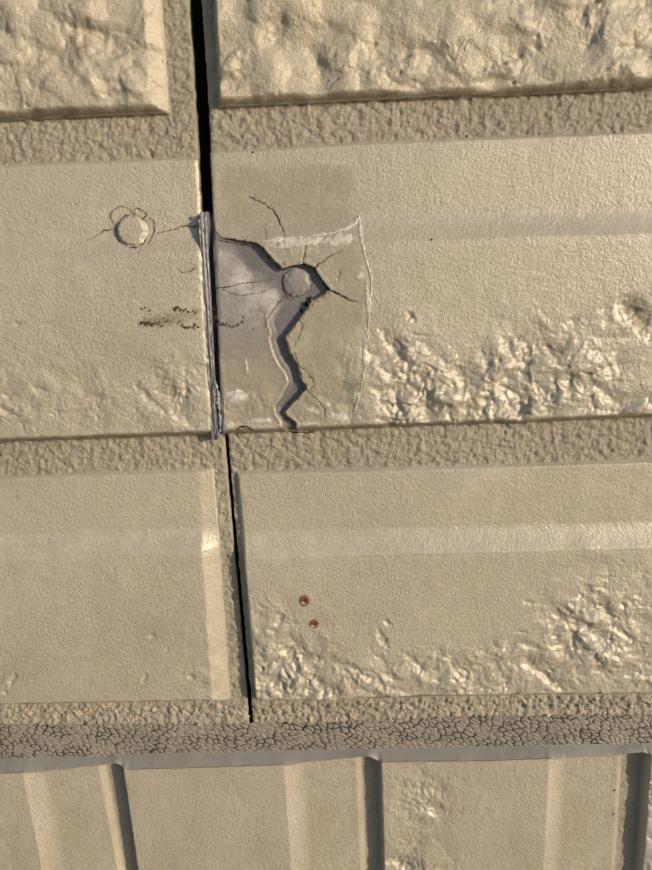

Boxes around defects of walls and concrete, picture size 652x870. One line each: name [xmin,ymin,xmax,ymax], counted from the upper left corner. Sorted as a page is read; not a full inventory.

crack [251,197,284,242]
crack [303,245,357,302]
spalling [213,229,329,434]
crack [0,714,652,759]